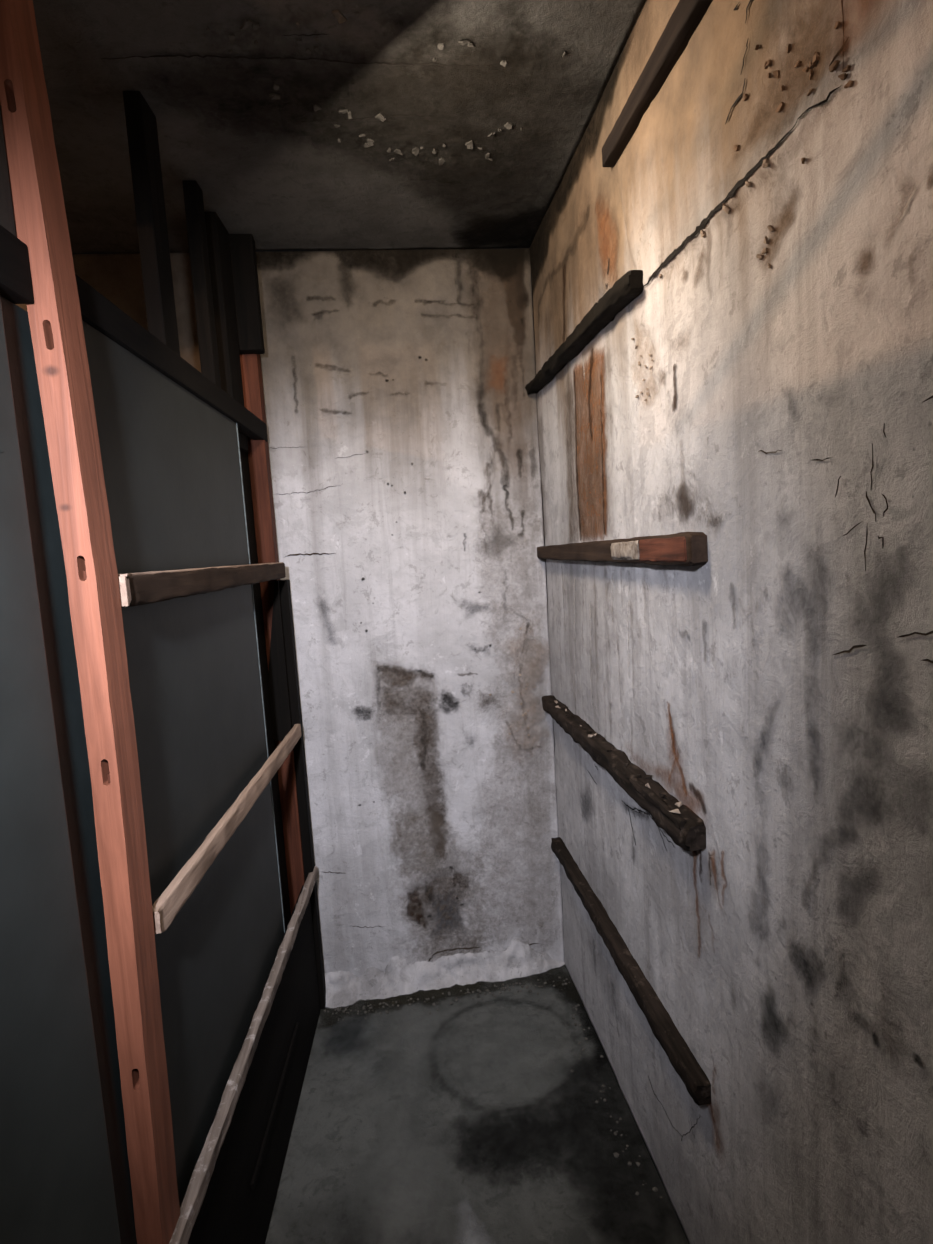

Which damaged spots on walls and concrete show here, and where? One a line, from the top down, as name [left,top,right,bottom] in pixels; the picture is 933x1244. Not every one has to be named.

crack [643,0,854,287]
water stain [481,449,525,536]
corrosion [574,349,607,540]
water stain [870,642,907,753]
water stain [380,666,467,939]
corrosion [667,705,706,813]
corrosion [692,851,726,952]
water stain [762,996,785,1041]
water stain [792,945,821,988]
water stain [458,977,684,1244]